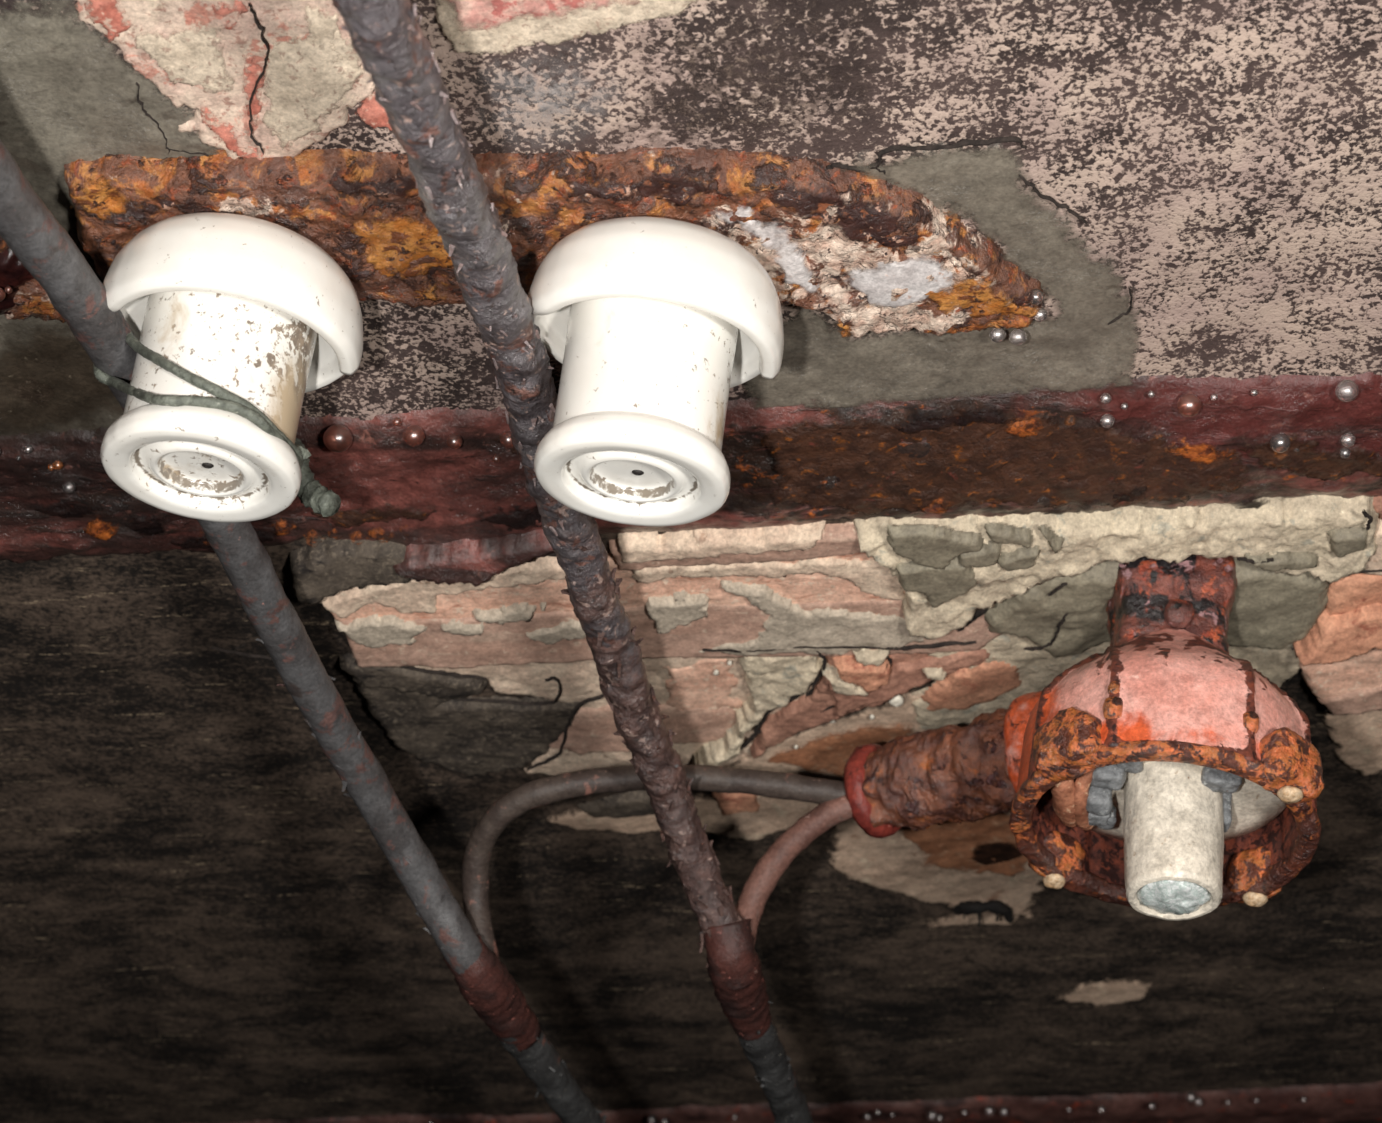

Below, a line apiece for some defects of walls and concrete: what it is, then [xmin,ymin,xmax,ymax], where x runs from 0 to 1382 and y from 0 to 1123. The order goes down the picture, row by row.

peeling [74,0,392,161]
crack [248,2,269,155]
peeling [436,0,696,55]
corrosion [0,236,66,323]
corrosion [352,216,453,301]
corrosion [761,183,920,253]
corrosion [925,267,1039,320]
corrosion [762,405,1382,516]
flaking render [319,529,632,776]
flaking render [608,495,1382,781]
flaking render [692,792,819,840]
flaking render [829,809,1045,927]